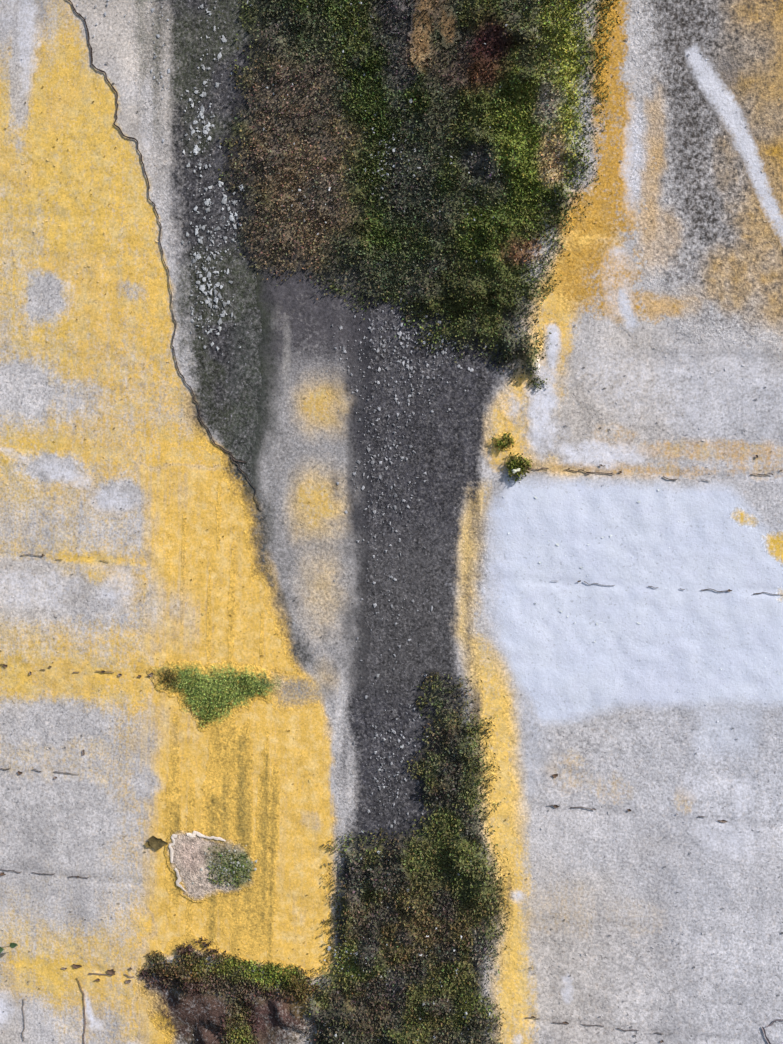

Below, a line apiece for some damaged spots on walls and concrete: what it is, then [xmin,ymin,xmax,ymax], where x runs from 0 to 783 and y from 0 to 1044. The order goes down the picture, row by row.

crack [68,0,259,508]
leakage [281,311,292,415]
peeling [0,0,339,1044]
leakage [215,479,338,712]
leakage [164,701,280,960]